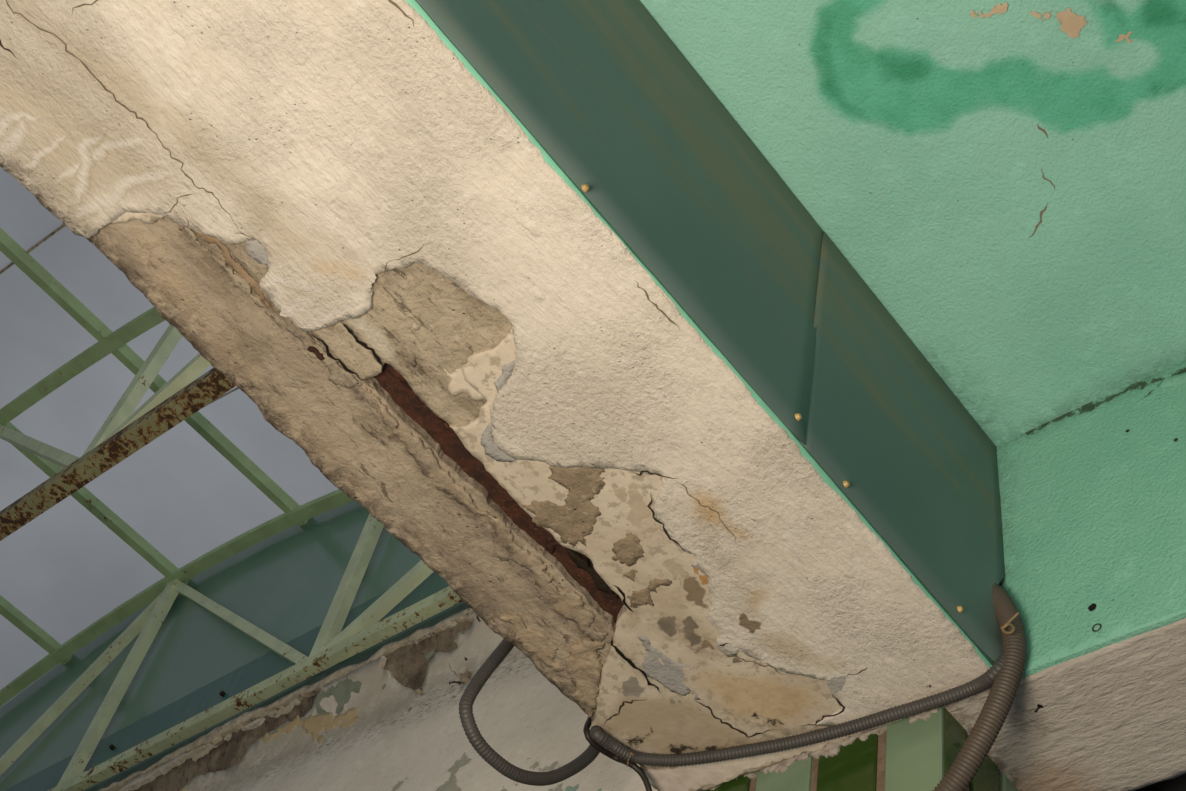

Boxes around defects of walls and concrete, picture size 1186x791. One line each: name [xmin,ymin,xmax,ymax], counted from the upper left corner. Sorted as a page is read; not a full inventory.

peeling [970,2,1008,19]
peeling [1030,7,1087,39]
water stain [802,0,1186,143]
crack [6,0,249,237]
spalling [86,212,846,769]
crack [613,585,633,612]
crack [718,643,792,676]
crack [604,637,659,724]
spalling [133,677,361,791]
crack [696,701,770,738]
peeling [435,752,471,791]
peeling [692,759,785,791]